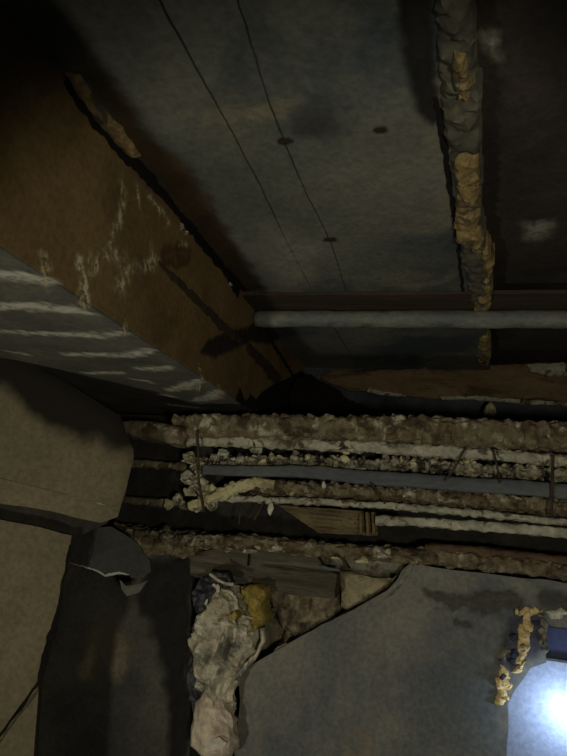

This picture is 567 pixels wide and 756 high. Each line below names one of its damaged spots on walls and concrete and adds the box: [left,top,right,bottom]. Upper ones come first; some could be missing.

water stain [0,183,125,315]
spalling [66,72,141,158]
crack [64,76,249,298]
spalling [434,0,495,311]
spalling [494,606,567,705]